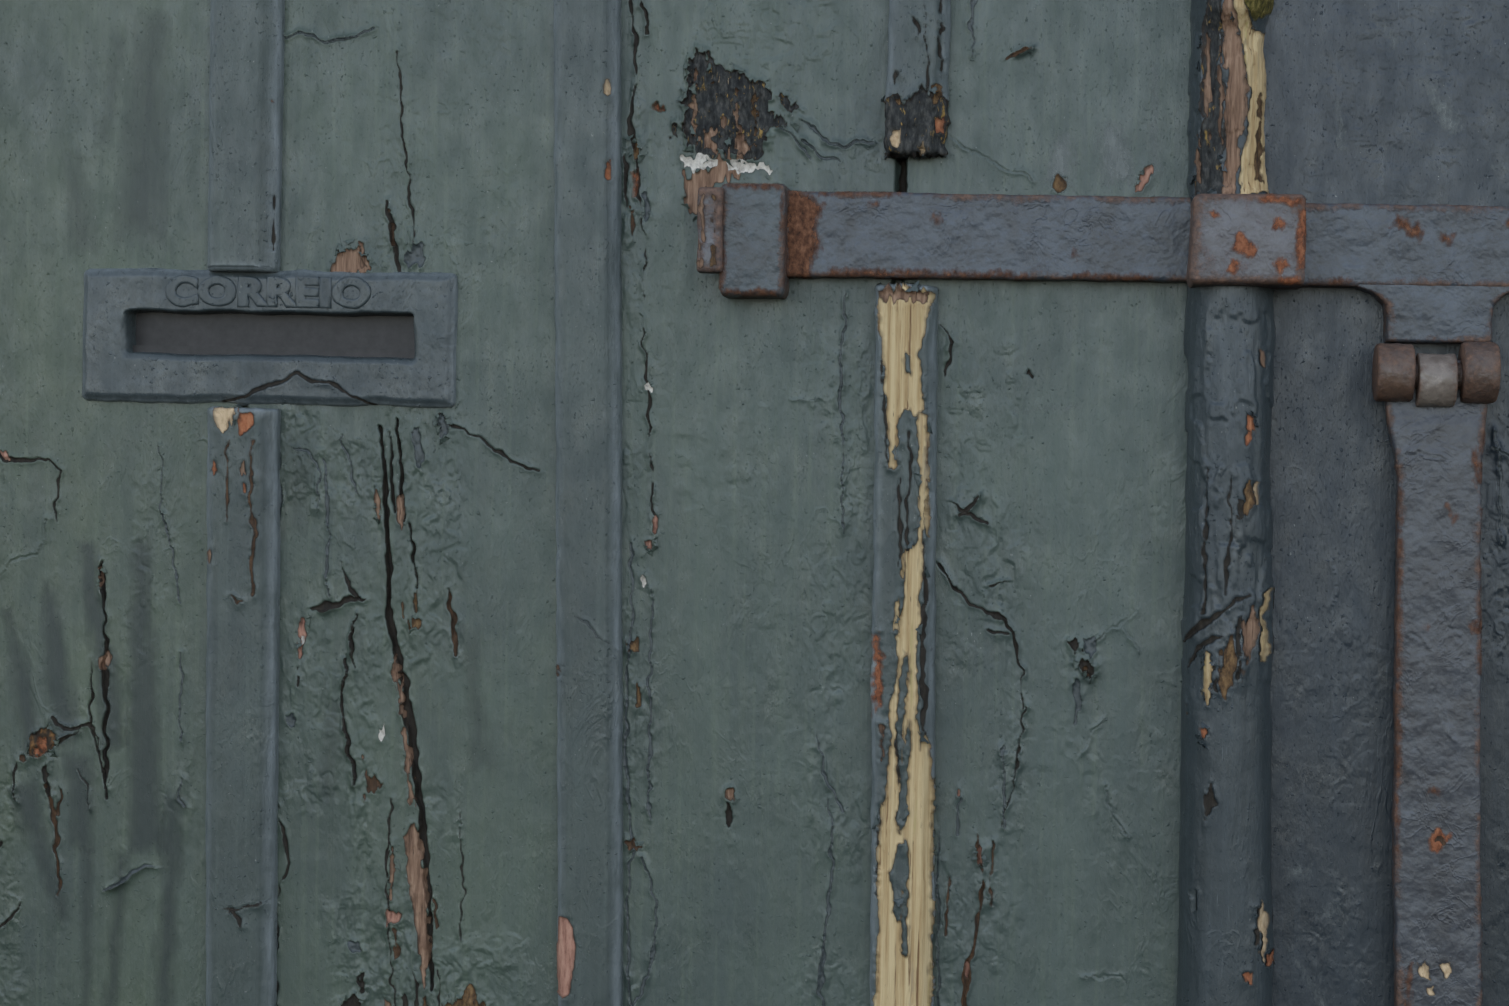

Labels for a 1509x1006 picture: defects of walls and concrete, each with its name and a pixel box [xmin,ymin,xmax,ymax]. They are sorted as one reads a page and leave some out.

crack [284,27,415,272]
peeling [669,48,800,175]
corrosion [736,183,892,279]
peeling [1189,0,1265,202]
corrosion [1226,231,1257,274]
corrosion [1260,193,1306,285]
corrosion [1396,217,1454,243]
crack [12,561,110,896]
crack [222,371,467,1006]
peeling [378,653,486,1006]
crack [816,360,1027,1006]
peeling [1195,587,1275,748]